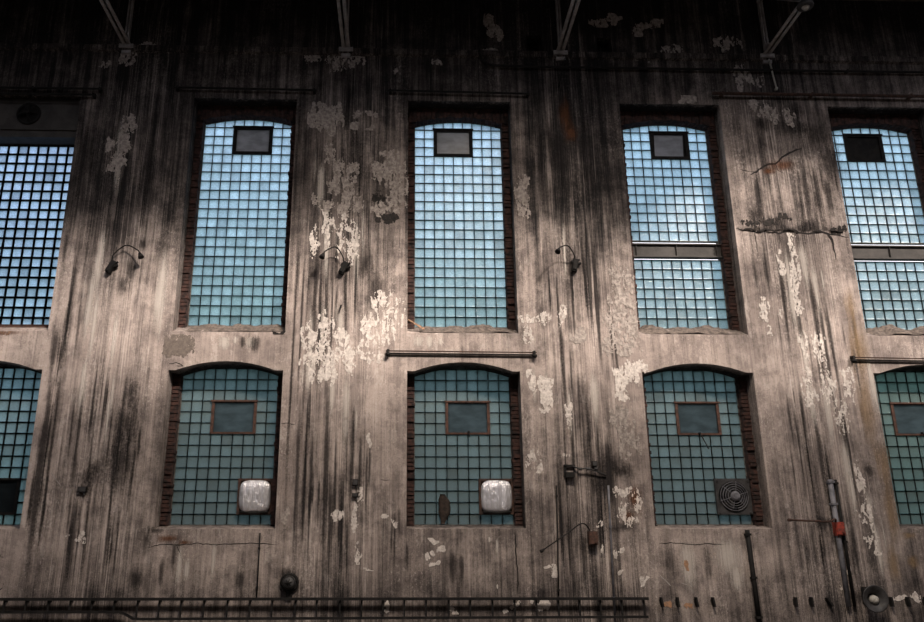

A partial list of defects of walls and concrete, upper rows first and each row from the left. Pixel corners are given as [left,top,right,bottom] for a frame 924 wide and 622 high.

peeling [307,101,409,265]
crack [741,148,802,175]
damp [23,235,141,571]
damp [154,257,167,333]
peeling [298,290,407,387]
peeling [526,369,554,414]
damp [562,230,575,331]
damp [548,271,630,580]
damp [581,227,618,368]
peeling [601,264,649,460]
peeling [797,331,856,435]
peeling [612,486,643,528]